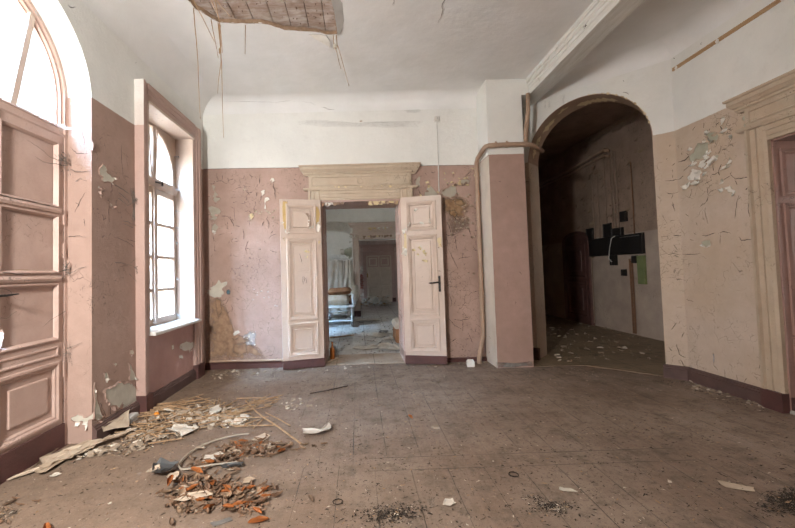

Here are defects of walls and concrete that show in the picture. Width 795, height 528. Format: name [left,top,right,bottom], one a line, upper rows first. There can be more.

crack [75,146,135,246]
crack [213,174,280,259]
peeling [415,167,481,247]
peeling [680,117,736,196]
crack [665,123,751,257]
damp [209,299,261,359]
spalling [70,362,140,430]